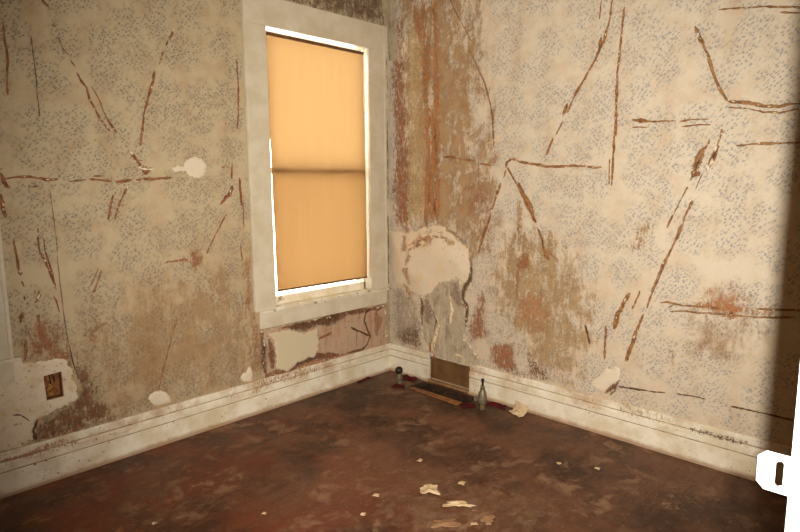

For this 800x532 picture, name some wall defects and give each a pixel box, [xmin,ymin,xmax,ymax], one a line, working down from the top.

crack [42,0,174,147]
leakage [391,0,499,259]
crack [0,168,171,220]
crack [237,178,245,225]
crack [443,0,800,364]
crack [13,239,28,361]
crack [37,228,60,313]
peeling [253,305,388,393]
flaking render [419,269,482,366]
leakage [492,201,596,380]
crack [618,386,705,399]
crack [731,406,793,421]